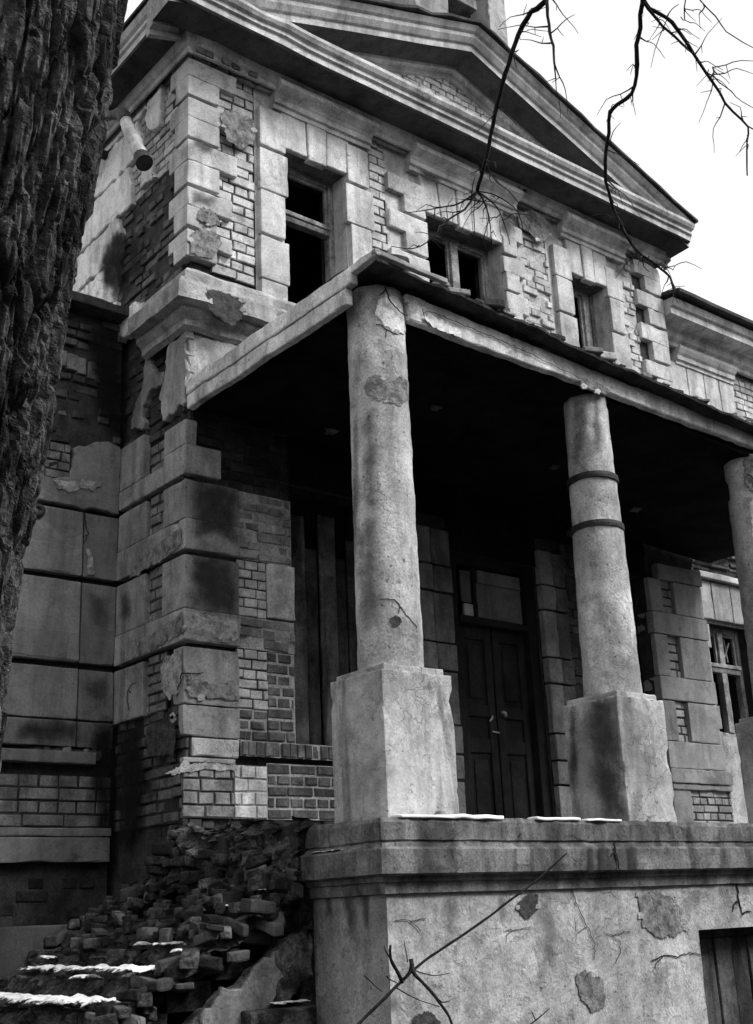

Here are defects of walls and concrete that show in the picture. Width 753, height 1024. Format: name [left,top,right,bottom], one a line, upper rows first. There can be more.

spalling [206,288,247,326]
crack [376,283,589,382]
spalling [364,374,409,406]
damp [196,481,237,541]
damp [194,557,236,612]
spalling [130,613,241,776]
spalling [43,825,316,1024]
spalling [515,893,541,919]
spalling [635,890,691,940]
crack [649,893,700,967]
crack [732,884,751,915]
spalling [576,966,605,1013]